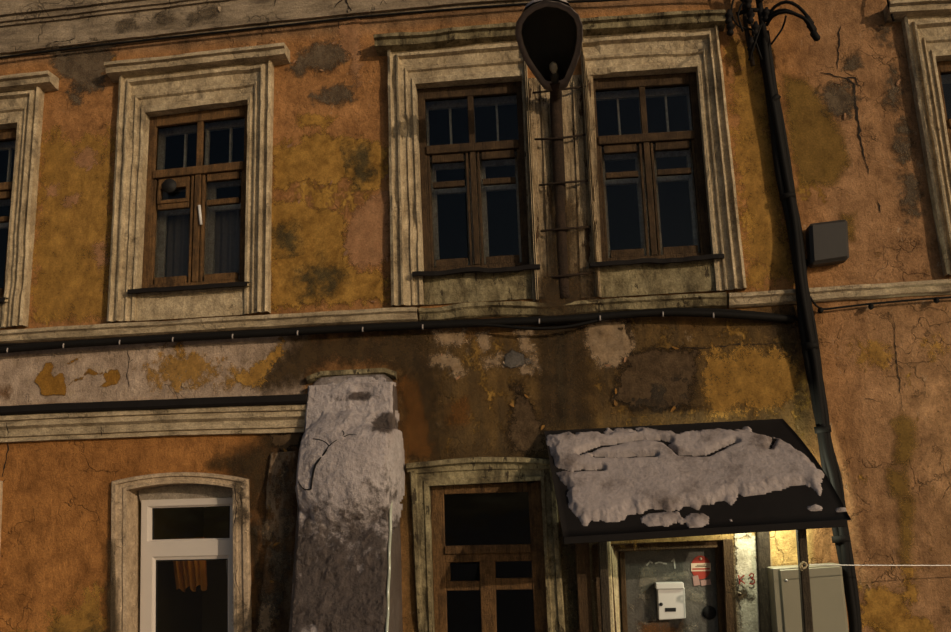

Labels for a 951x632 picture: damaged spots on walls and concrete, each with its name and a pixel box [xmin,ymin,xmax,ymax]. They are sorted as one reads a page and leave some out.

crack [821,26,869,174]
peeling [35,358,121,396]
peeling [132,337,287,396]
water stain [90,541,119,632]